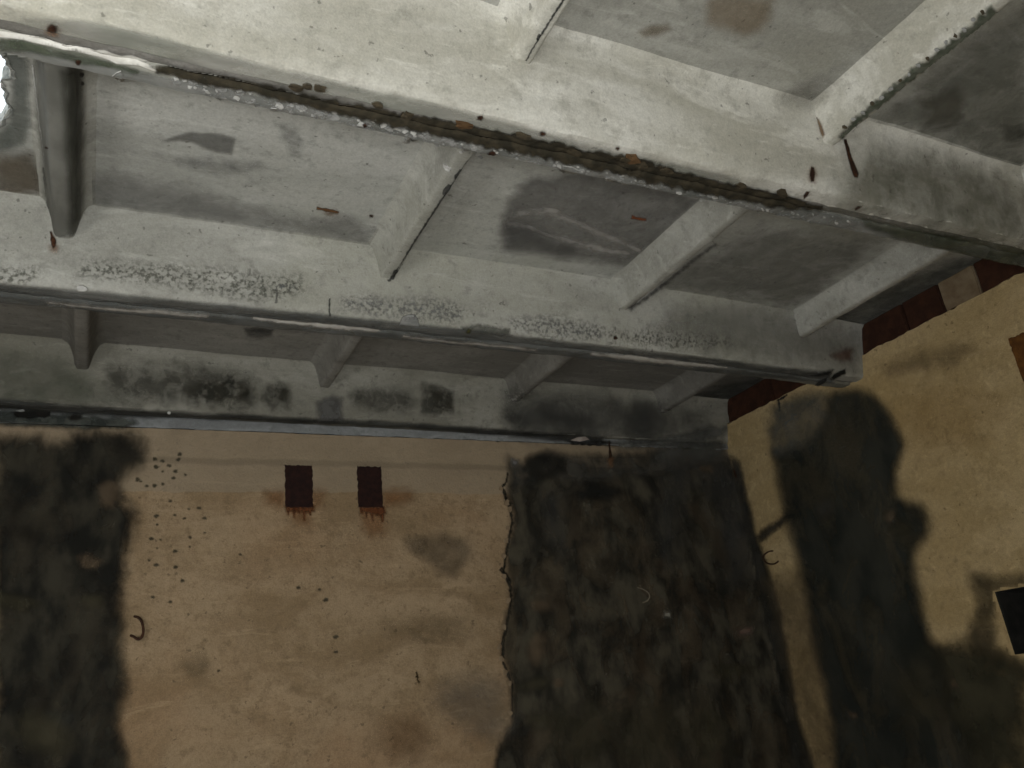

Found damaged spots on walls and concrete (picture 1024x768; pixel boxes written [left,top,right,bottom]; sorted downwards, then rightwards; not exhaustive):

leakage [170,133,234,153]
spalling [156,65,856,230]
corrosion [844,139,858,177]
leakage [503,175,694,263]
leakage [110,368,289,407]